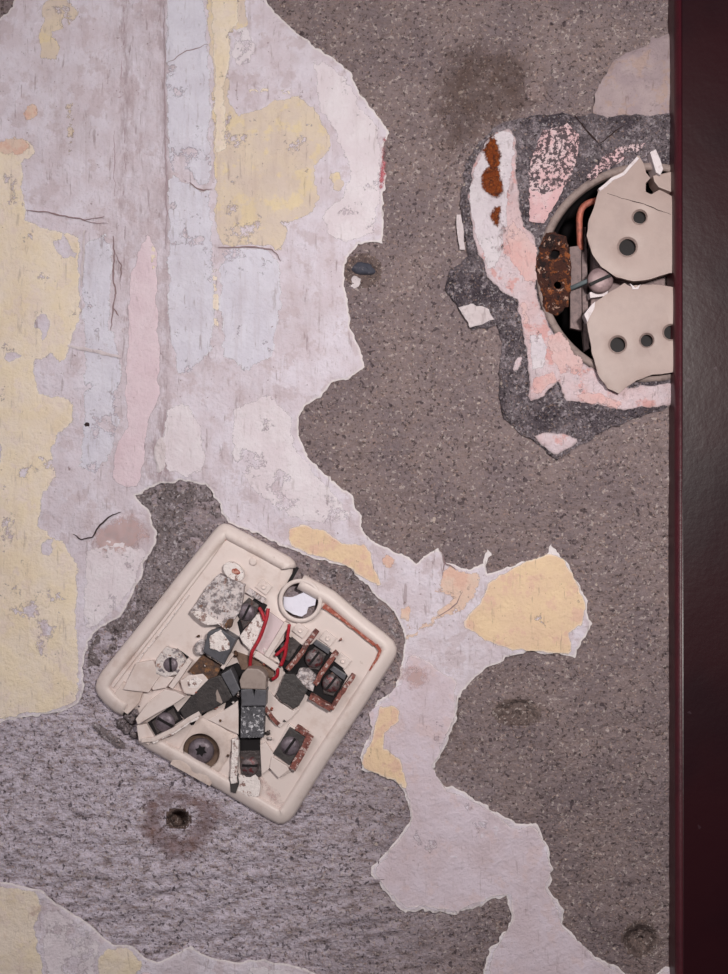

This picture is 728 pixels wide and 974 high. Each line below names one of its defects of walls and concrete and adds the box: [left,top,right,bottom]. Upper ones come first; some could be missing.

rust [481,136,504,227]
spalling [446,34,671,460]
crack [73,512,121,540]
flaking render [100,483,214,657]
peeling [560,581,592,658]
peeling [360,694,407,789]
peeling [431,715,457,768]
peeling [442,784,553,872]
peeling [0,882,316,974]
peeling [461,894,513,928]
peeling [483,931,507,974]
peeling [545,875,577,941]